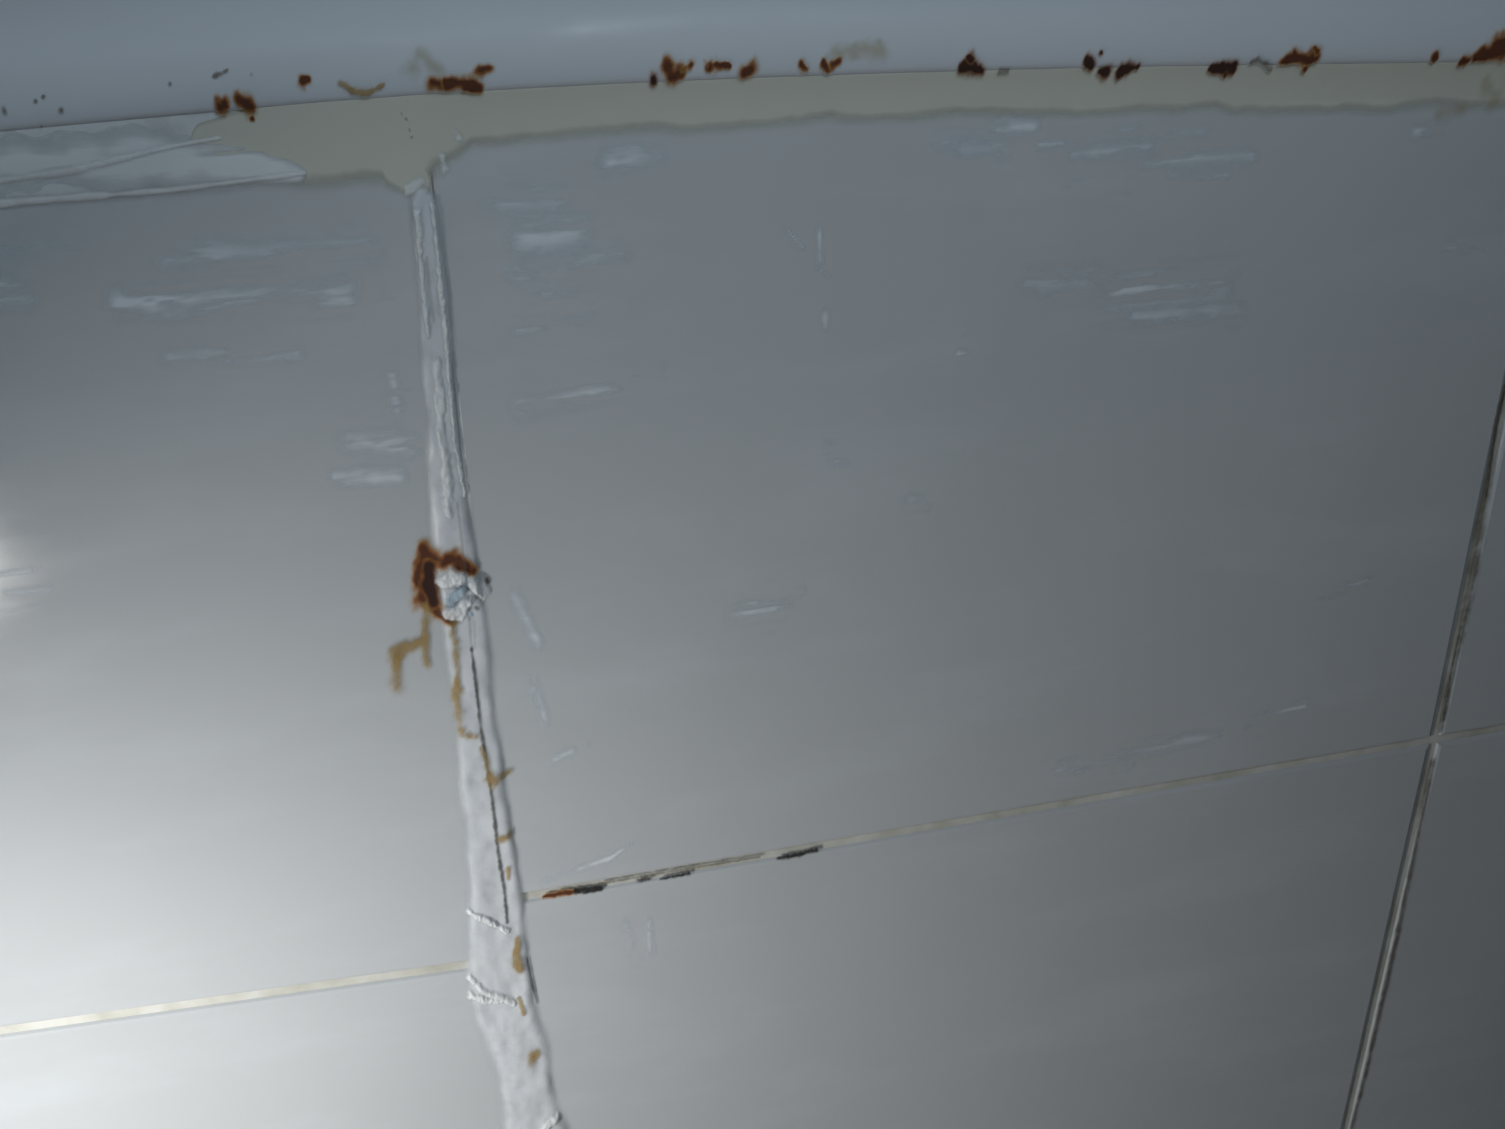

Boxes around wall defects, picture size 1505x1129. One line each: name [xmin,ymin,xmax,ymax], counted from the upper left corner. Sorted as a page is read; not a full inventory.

corrosion [427,64,494,94]
corrosion [650,55,757,87]
corrosion [958,52,1009,76]
corrosion [1083,50,1140,80]
corrosion [1207,45,1321,78]
corrosion [1458,30,1505,67]
corrosion [215,91,256,122]
crack [1485,391,1505,498]
corrosion [389,540,510,786]
crack [1443,626,1462,719]
crack [470,648,508,924]
crack [526,958,538,1003]